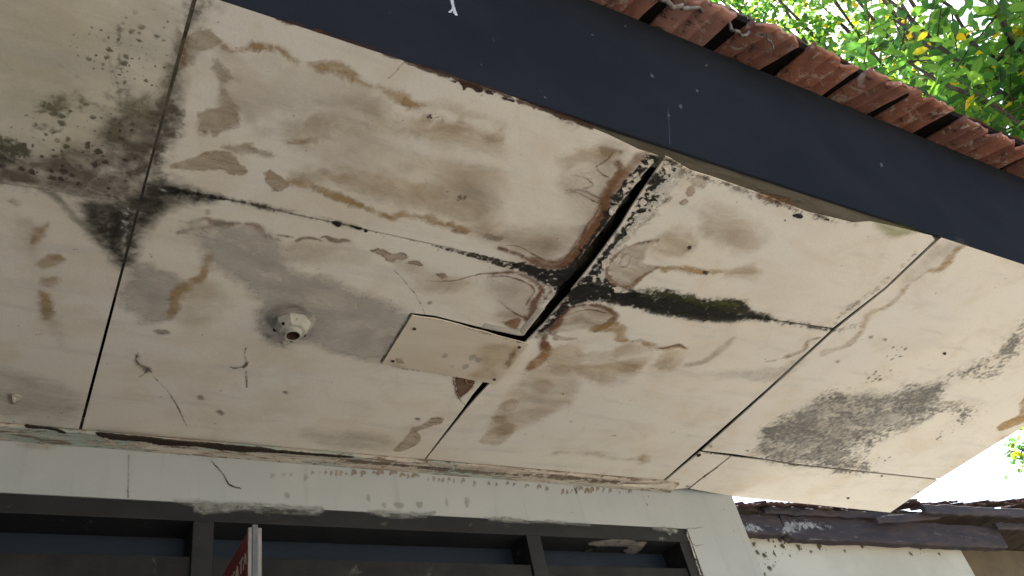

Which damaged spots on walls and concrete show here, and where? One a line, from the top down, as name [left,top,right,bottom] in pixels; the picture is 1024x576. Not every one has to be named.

mould [77,28,173,88]
water stain [0,97,247,264]
water stain [266,170,286,191]
water stain [324,190,367,209]
water stain [168,265,207,313]
water stain [432,244,637,337]
water stain [658,266,709,274]
water stain [592,322,687,349]
mould [963,324,1023,378]
peeling [81,434,153,448]
mould [761,383,971,477]
peeling [349,460,675,506]